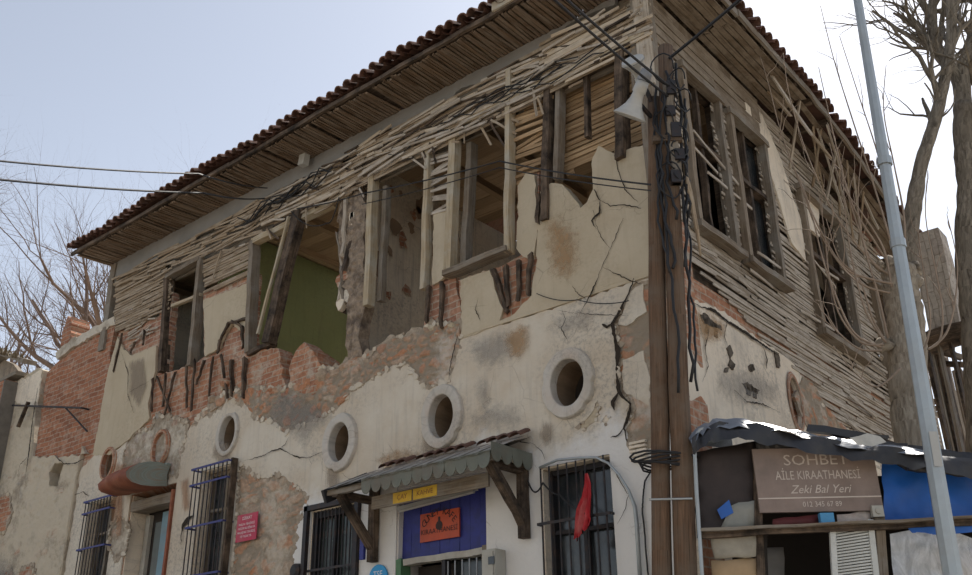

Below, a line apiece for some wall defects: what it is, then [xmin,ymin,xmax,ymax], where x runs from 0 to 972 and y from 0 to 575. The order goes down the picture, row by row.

crack [555,161,641,441]
spalling [700,313,722,338]
spalling [724,345,735,373]
flaking render [121,317,463,480]
spalling [742,364,760,399]
crack [249,439,321,460]
flaking render [0,492,14,536]
flaking render [230,461,310,575]
flaking render [0,562,37,575]